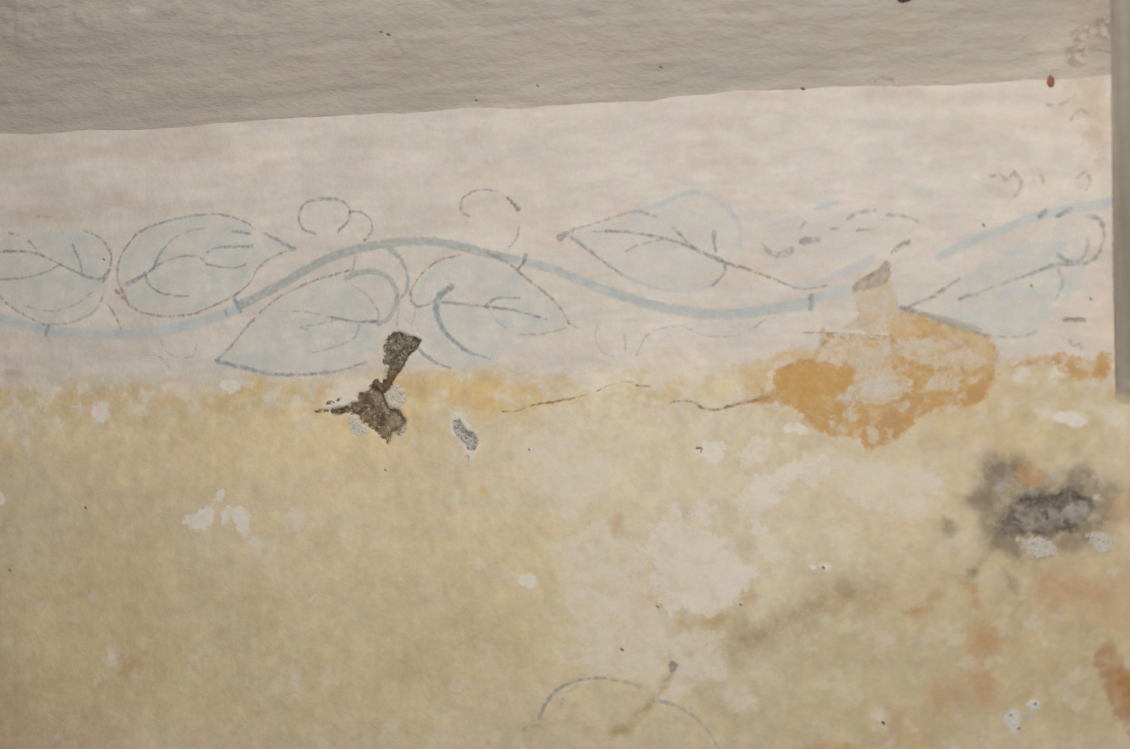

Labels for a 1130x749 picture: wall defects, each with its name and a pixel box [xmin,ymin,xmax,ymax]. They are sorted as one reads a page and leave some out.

spalling [314,332,426,444]
crack [673,398,775,411]
spalling [450,412,480,465]